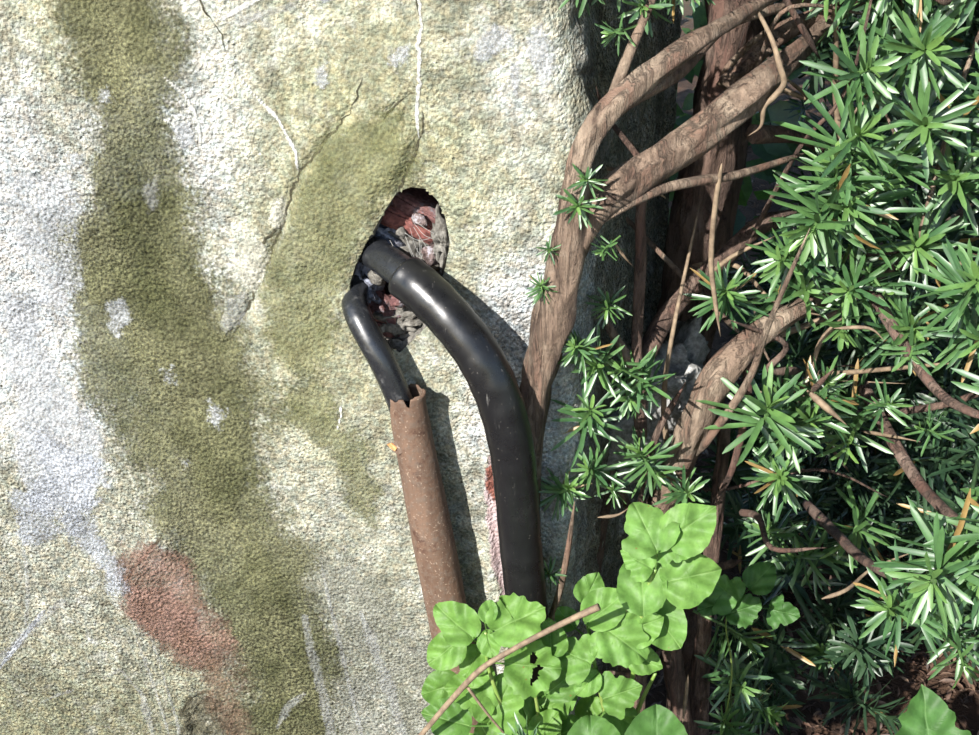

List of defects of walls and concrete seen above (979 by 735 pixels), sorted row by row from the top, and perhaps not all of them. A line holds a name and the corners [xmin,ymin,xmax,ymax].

damp [70,0,163,96]
crack [199,0,225,50]
damp [164,77,201,139]
damp [234,69,298,169]
crack [222,80,362,356]
damp [78,187,434,735]
corrosion [114,543,236,669]